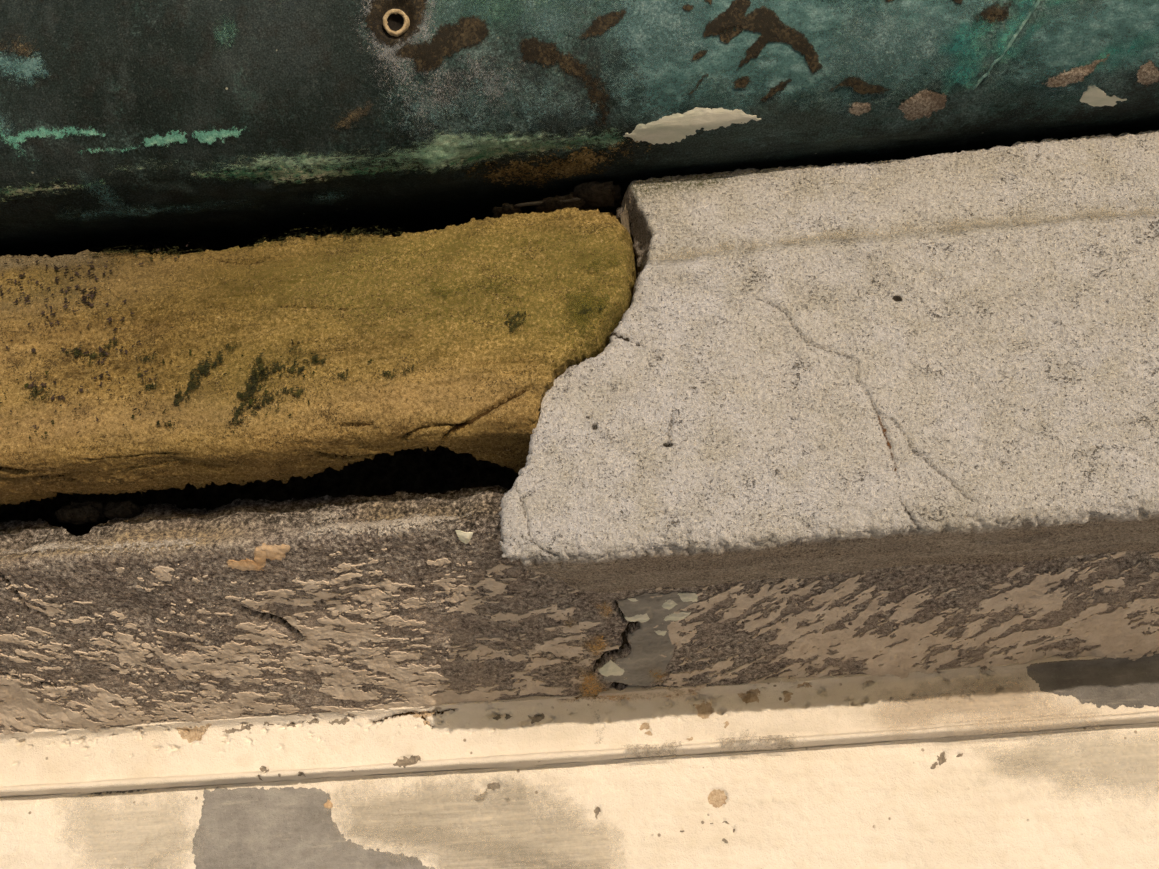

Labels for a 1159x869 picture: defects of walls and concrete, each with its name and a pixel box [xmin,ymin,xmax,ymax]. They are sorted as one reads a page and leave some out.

crack [756,299,973,525]
peeling [0,548,630,743]
peeling [612,550,1159,719]